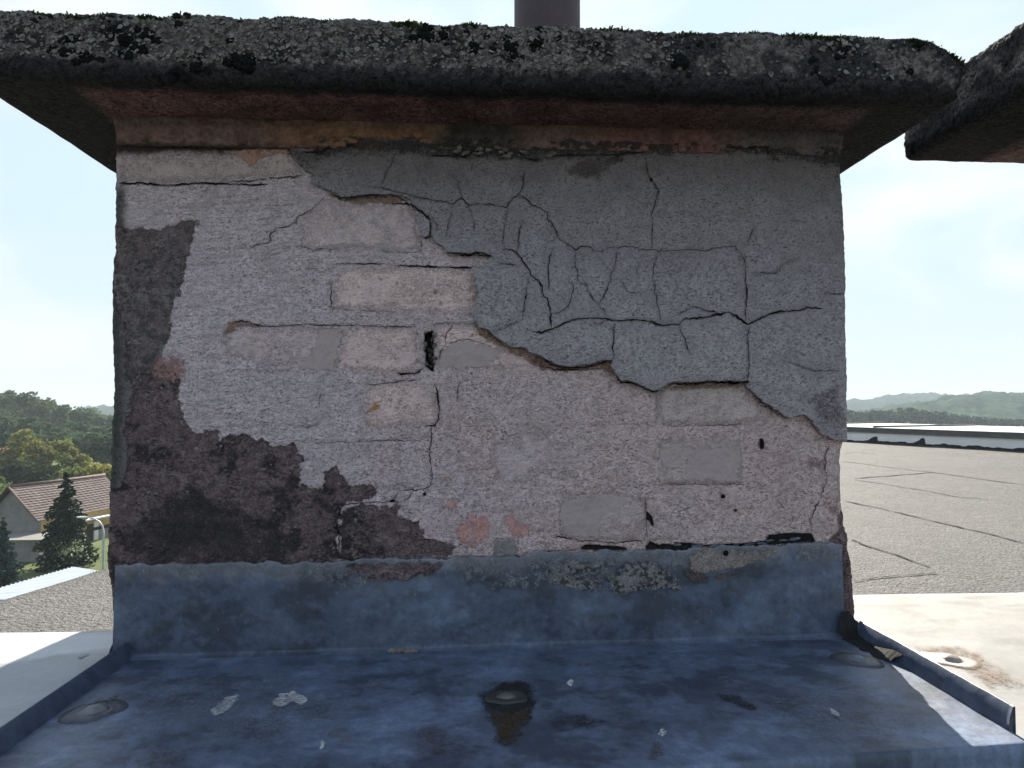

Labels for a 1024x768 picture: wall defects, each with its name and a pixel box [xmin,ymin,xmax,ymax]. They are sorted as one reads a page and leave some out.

peeling [107,220,475,613]
spalling [300,202,419,252]
crack [118,144,846,564]